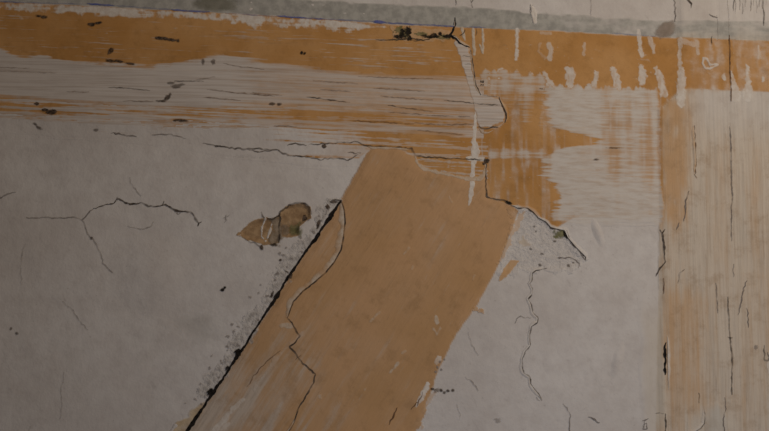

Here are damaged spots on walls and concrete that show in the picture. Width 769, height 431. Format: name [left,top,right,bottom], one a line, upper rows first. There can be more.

crack [52,198,201,272]
peeling [0,2,765,279]
crack [215,141,588,260]
crack [656,125,697,294]
crack [727,133,735,236]
spalling [170,197,343,431]
crack [186,199,346,431]
peeling [415,381,454,407]
crack [515,268,546,401]
crack [663,335,672,390]
crack [723,337,733,431]
crack [716,267,749,328]